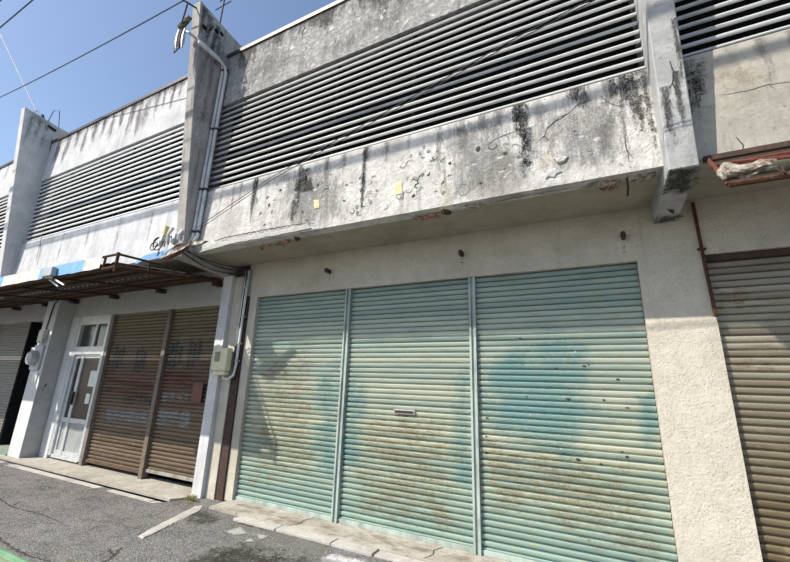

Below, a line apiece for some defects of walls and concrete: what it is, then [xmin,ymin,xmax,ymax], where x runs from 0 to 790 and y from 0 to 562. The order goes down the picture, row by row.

water stain [287,158,337,221]
water stain [436,103,534,189]
crack [536,96,622,143]
water stain [549,69,657,165]
water stain [661,17,707,135]
corrosion [257,348,313,478]
corrosion [357,415,452,526]
corrosion [483,440,652,529]